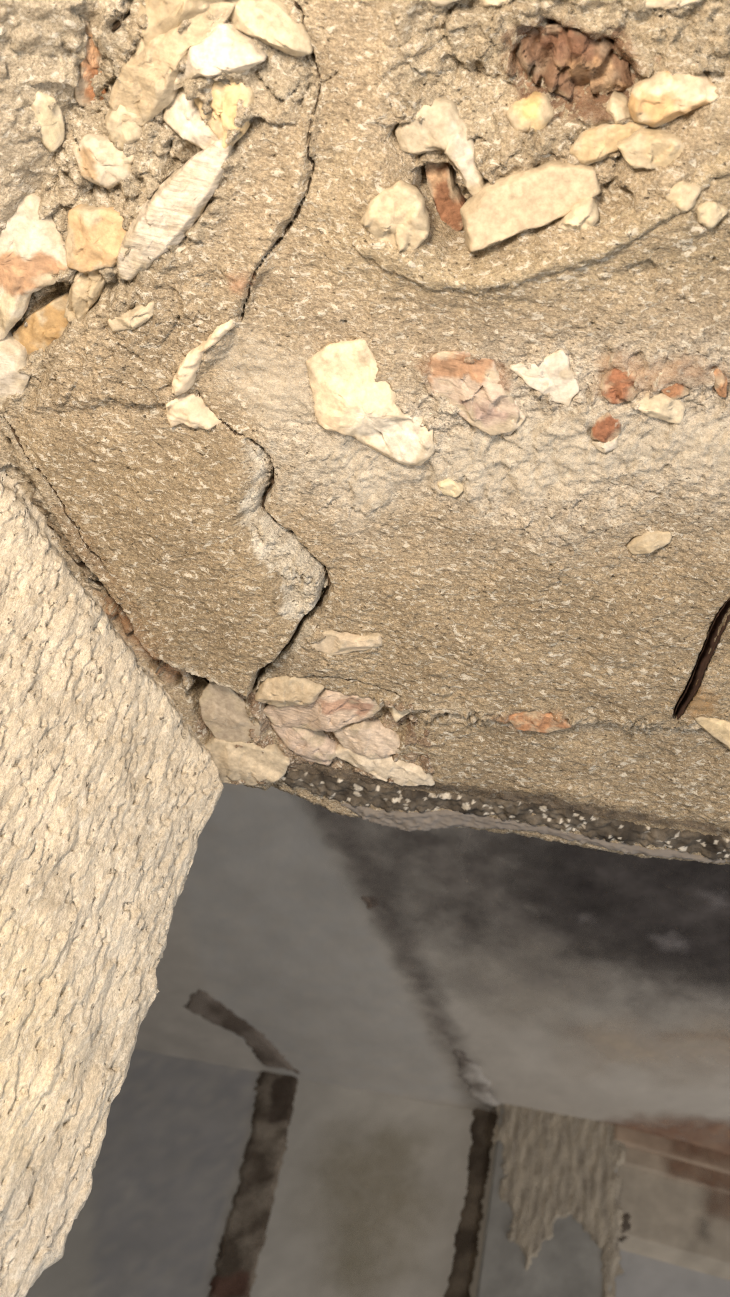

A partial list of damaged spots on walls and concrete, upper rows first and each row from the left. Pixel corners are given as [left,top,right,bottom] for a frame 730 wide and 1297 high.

spalling [37,0,203,247]
spalling [177,13,304,225]
crack [242,1,337,317]
spalling [396,0,730,184]
rust [507,20,637,120]
spalling [9,267,78,334]
crack [3,416,110,596]
crack [198,392,294,533]
crack [253,557,331,687]
rust [673,598,730,719]
spalling [219,691,730,860]
peeling [443,1049,631,1297]